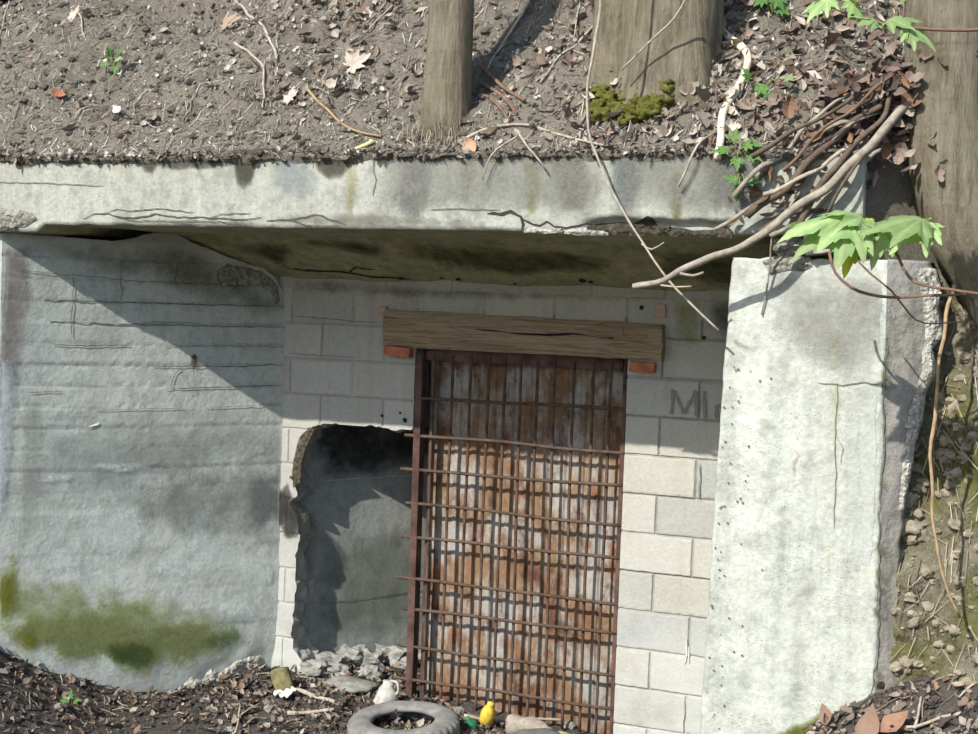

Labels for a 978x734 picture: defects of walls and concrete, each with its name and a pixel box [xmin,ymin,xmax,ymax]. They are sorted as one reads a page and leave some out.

crack [3,180,93,188]
spalling [0,207,37,231]
crack [83,208,346,227]
crack [431,208,591,231]
spalling [217,264,281,304]
crack [15,266,382,410]
spalling [898,268,942,510]
spalling [289,427,314,487]
crack [818,335,887,694]